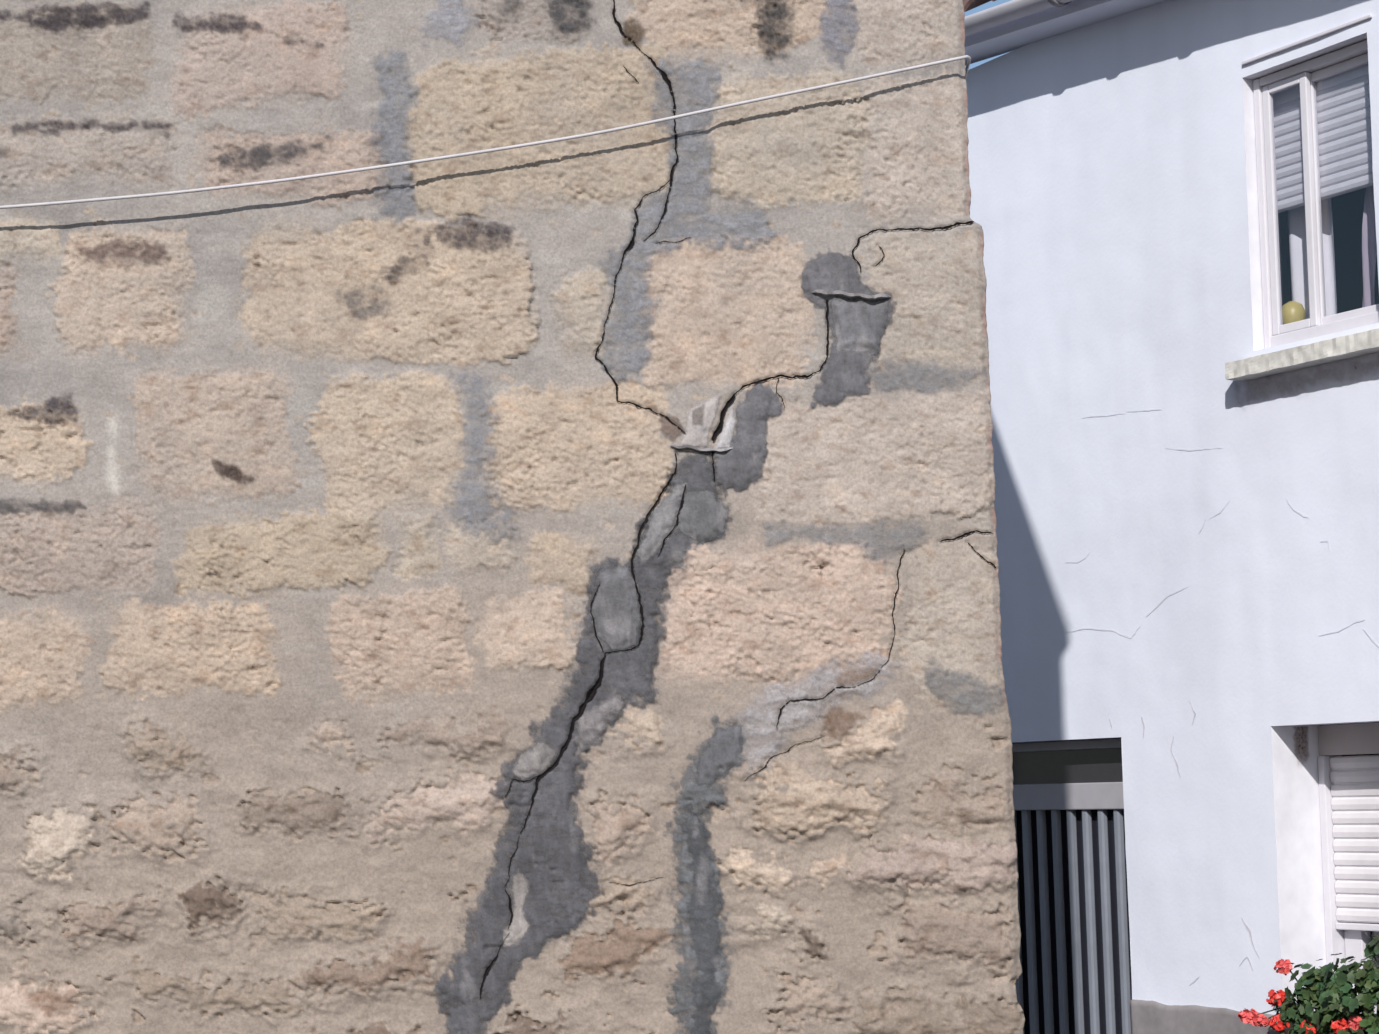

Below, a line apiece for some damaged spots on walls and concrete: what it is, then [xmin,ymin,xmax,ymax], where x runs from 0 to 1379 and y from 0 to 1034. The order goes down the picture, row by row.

crack [852,221,974,272]
crack [480,0,829,999]
crack [744,549,905,781]
crack [939,530,997,569]